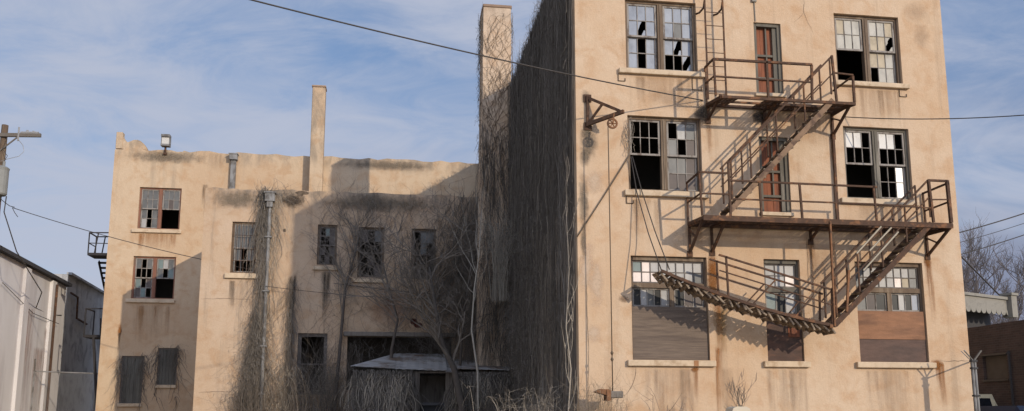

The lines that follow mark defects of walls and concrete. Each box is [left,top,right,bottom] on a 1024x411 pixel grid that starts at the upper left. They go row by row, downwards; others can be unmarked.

water stain [150,153,182,161]
water stain [282,196,301,206]